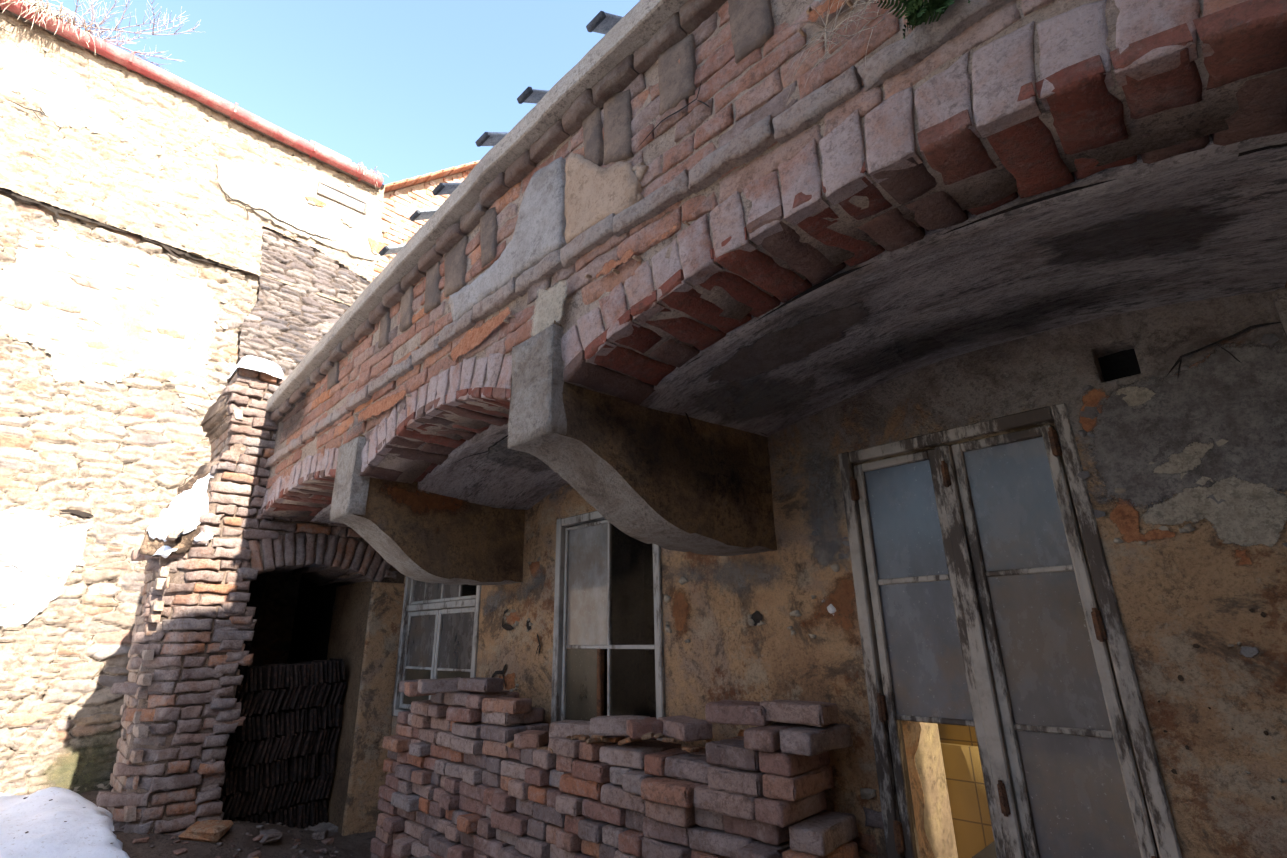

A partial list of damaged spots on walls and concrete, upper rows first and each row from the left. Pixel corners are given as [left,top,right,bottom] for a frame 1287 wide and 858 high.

peeling [0,225,228,410]
crack [0,188,244,271]
peeling [217,159,393,263]
peeling [447,152,649,362]
peeling [0,507,92,628]
spalling [747,611,766,626]